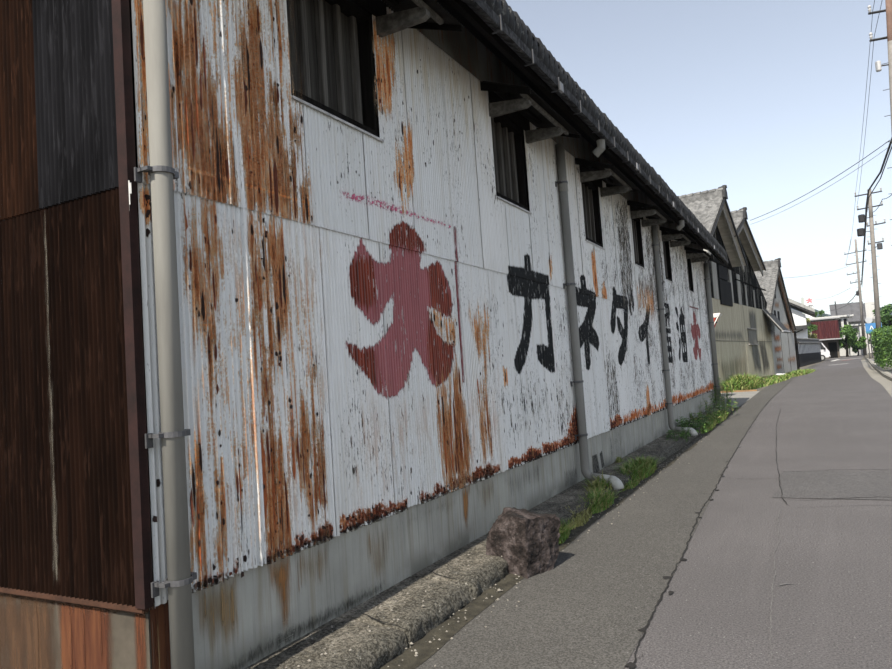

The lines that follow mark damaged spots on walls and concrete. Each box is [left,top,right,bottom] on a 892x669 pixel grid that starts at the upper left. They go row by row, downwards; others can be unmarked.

rust [394,119,414,213]
rust [591,249,607,299]
rust [165,0,408,635]
rust [419,306,579,523]
rust [610,380,714,431]
rust [0,593,120,669]
rust [135,600,171,669]